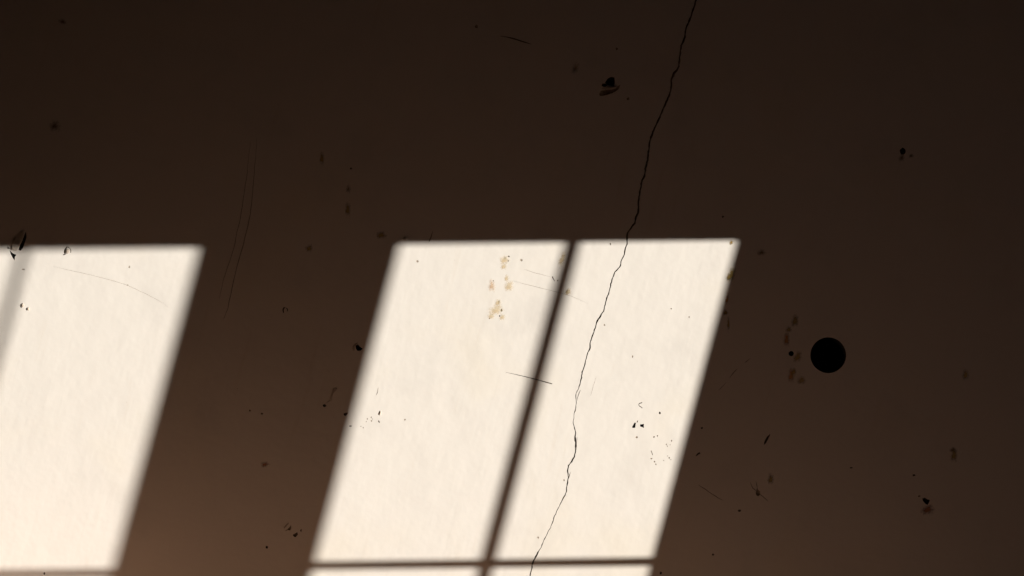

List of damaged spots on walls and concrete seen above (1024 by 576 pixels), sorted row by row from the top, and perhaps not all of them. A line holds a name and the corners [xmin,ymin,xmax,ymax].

crack [530,0,697,576]